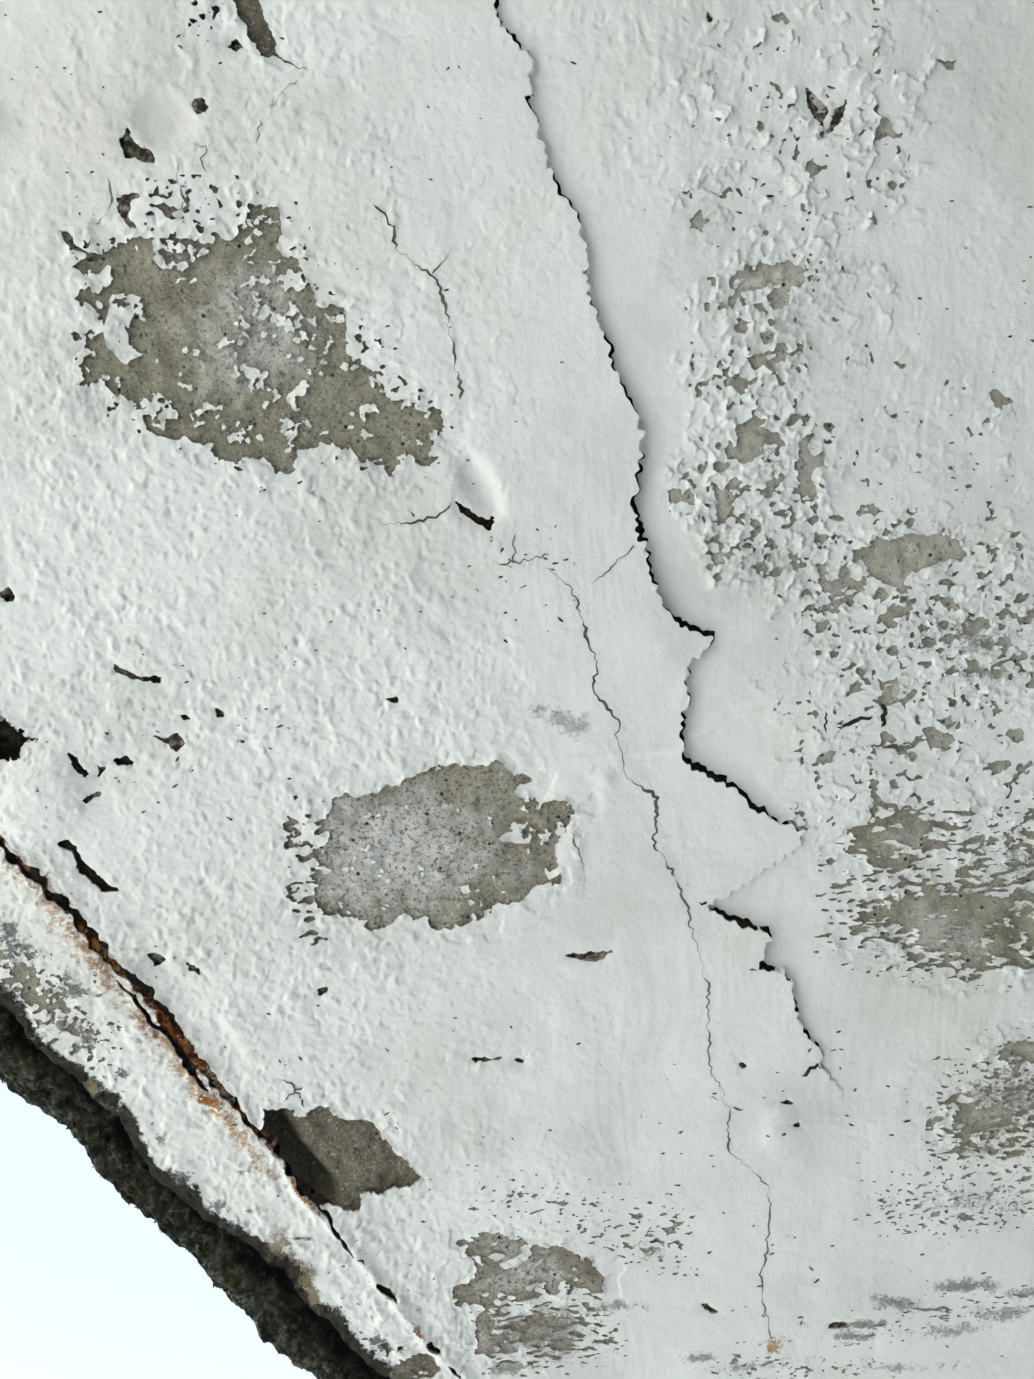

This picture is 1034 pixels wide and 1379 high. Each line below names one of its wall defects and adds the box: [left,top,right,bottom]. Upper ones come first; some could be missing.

spalling [189,0,283,59]
spalling [62,128,459,493]
crack [553,173,636,411]
peeling [667,254,1034,982]
crack [0,835,304,1139]
corrosion [3,860,320,1215]
spalling [283,760,574,945]
crack [499,453,824,1340]
spalling [263,1106,421,1211]
crack [296,1179,397,1302]
crack [427,1342,461,1378]
spalling [452,1169,693,1375]